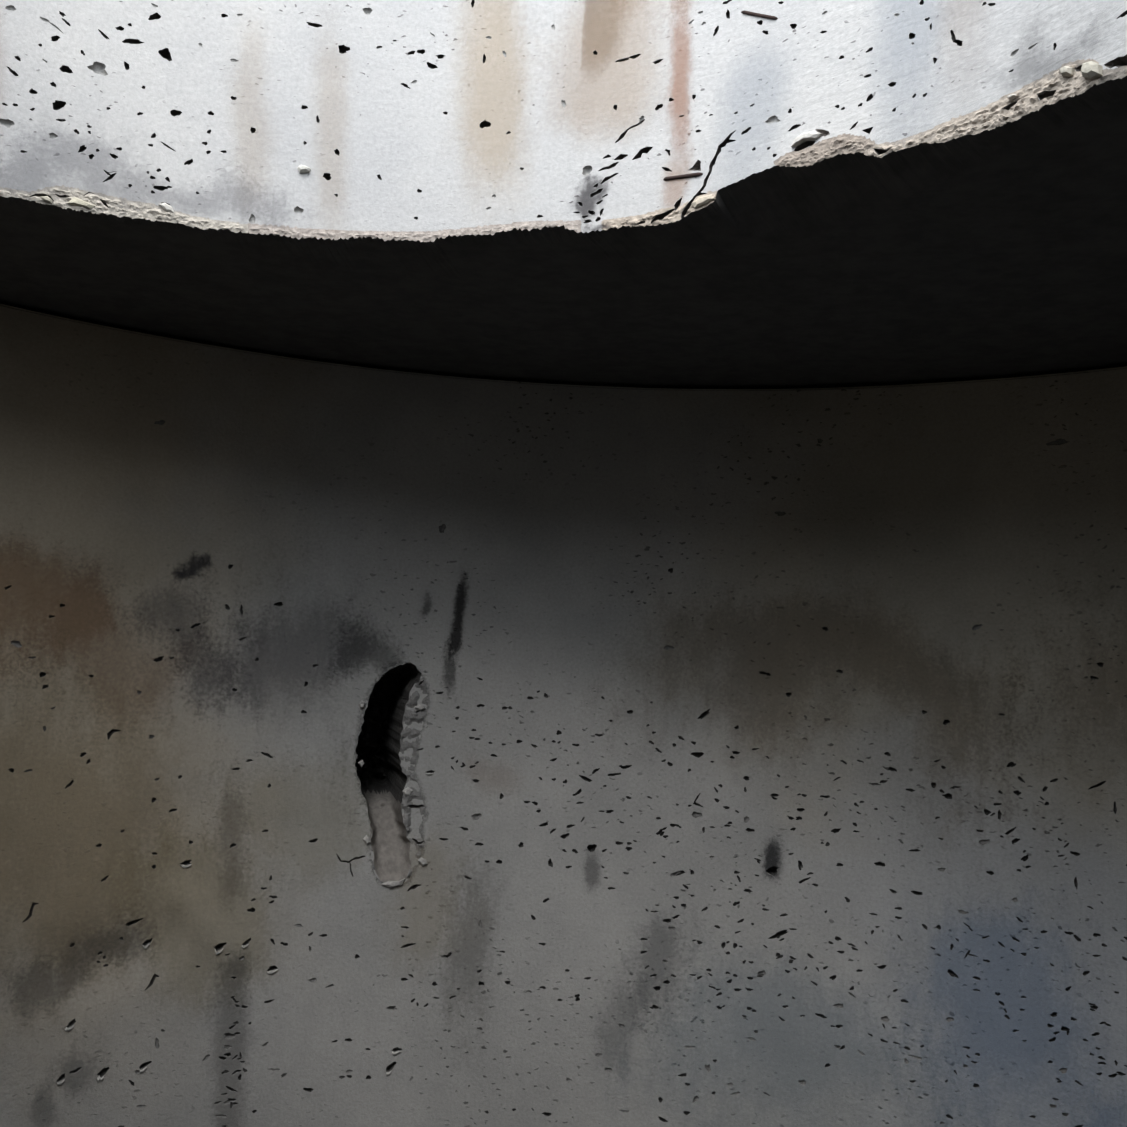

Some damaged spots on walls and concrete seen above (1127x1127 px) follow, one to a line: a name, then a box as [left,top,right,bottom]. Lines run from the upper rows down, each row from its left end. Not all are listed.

hole [408,49,445,69]
spalling [0,165,717,242]
crack [594,119,672,195]
crack [637,130,736,225]
spalling [752,54,1127,167]
leakage [448,573,467,655]
spalling [355,663,406,802]
spalling [363,675,434,888]